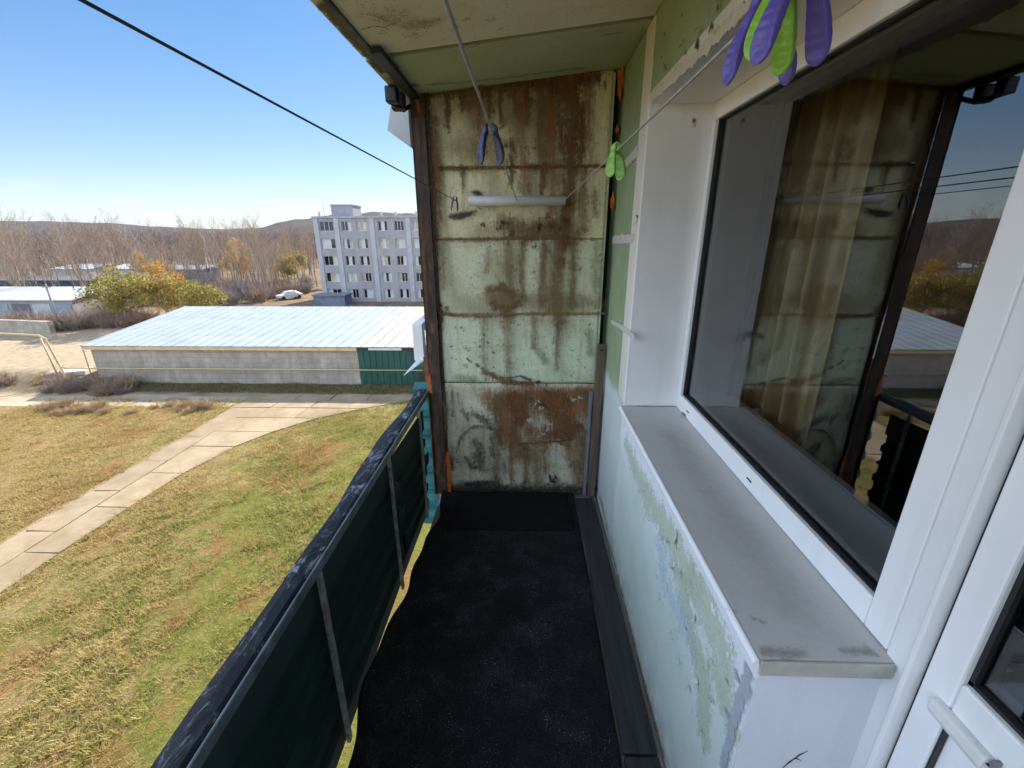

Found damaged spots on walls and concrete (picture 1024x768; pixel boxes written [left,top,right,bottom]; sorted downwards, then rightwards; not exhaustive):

rust [411,67,625,488]
peeling [624,439,753,768]